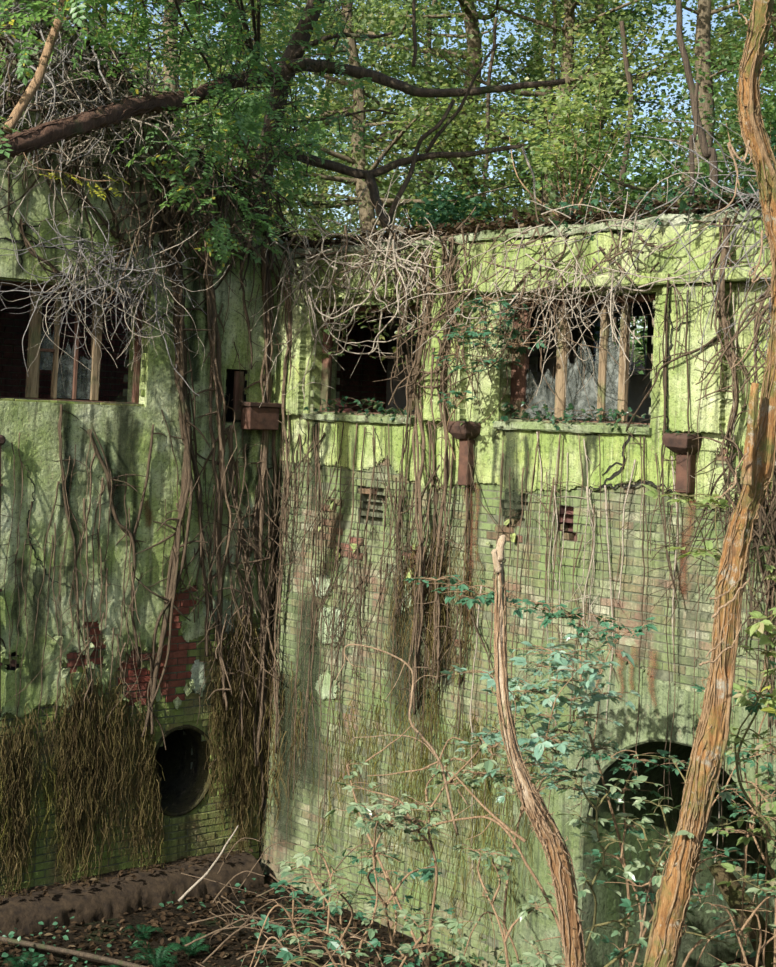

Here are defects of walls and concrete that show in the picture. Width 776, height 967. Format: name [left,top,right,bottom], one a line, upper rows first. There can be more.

crack [666,297,695,431]
water stain [59,401,77,605]
water stain [105,400,139,555]
water stain [492,418,529,516]
hole [556,505,577,541]
water stain [583,433,600,490]
crack [589,425,685,494]
water stain [13,559,45,684]
spalling [51,585,236,713]